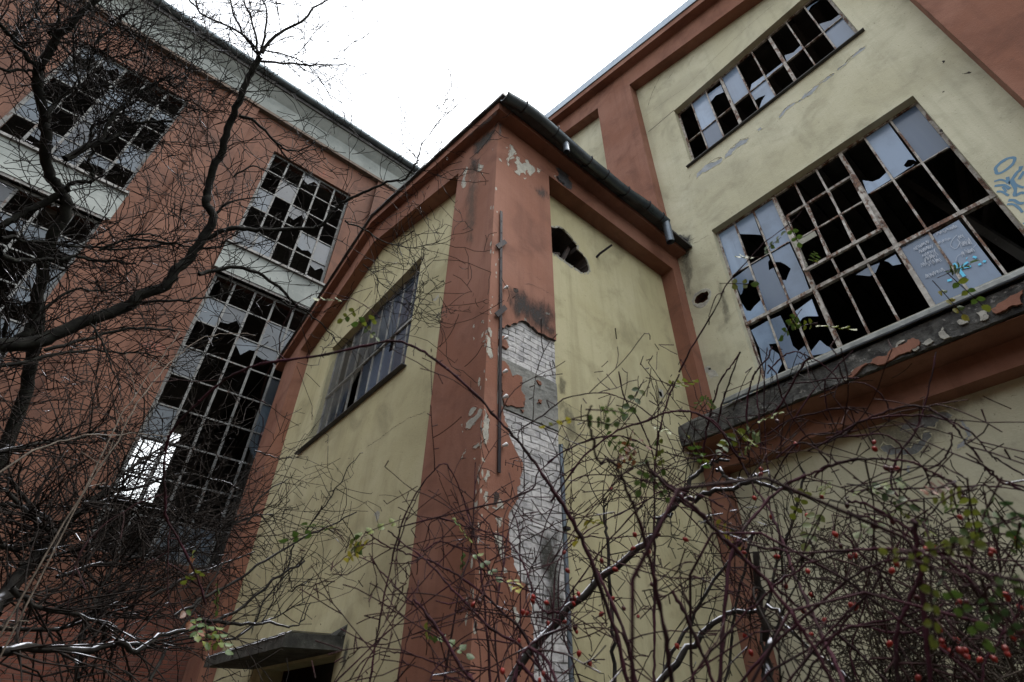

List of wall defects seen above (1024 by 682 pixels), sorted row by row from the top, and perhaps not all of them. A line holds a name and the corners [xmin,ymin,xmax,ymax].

peeling [492,144,573,191]
spalling [551,226,591,275]
leakage [510,291,554,334]
spalling [692,288,711,308]
peeling [957,290,1024,325]
peeling [842,327,951,382]
spalling [461,296,569,682]